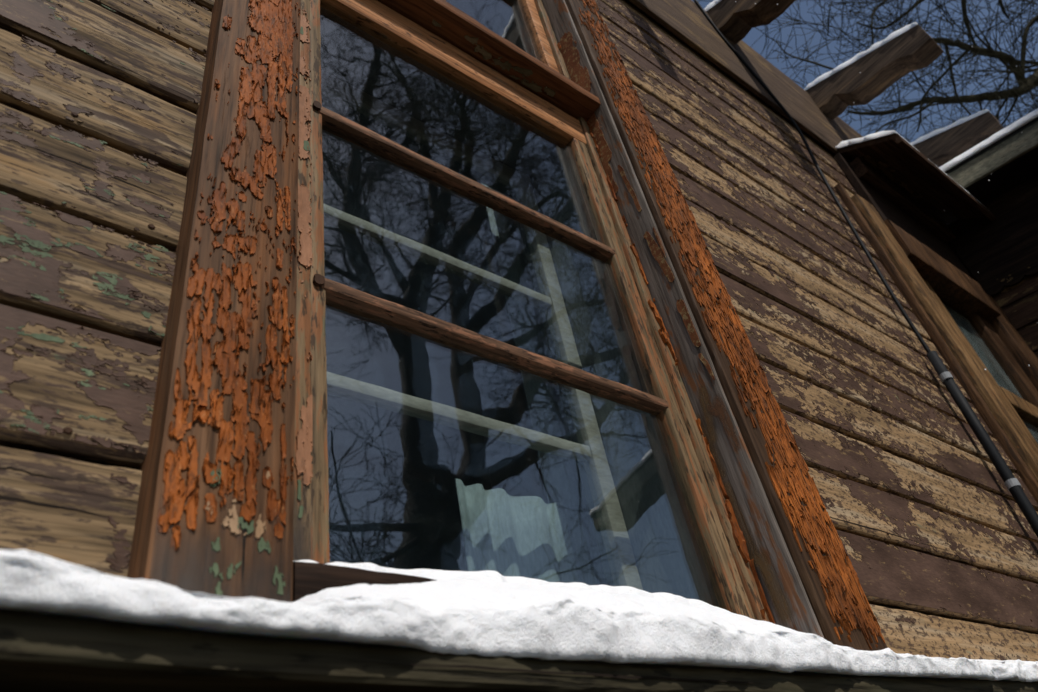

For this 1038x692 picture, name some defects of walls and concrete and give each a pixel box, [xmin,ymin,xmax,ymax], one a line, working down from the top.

peeling [0,0,177,455]
peeling [100,0,313,554]
peeling [557,31,592,92]
peeling [584,113,642,212]
peeling [595,0,1038,630]
peeling [90,516,131,578]